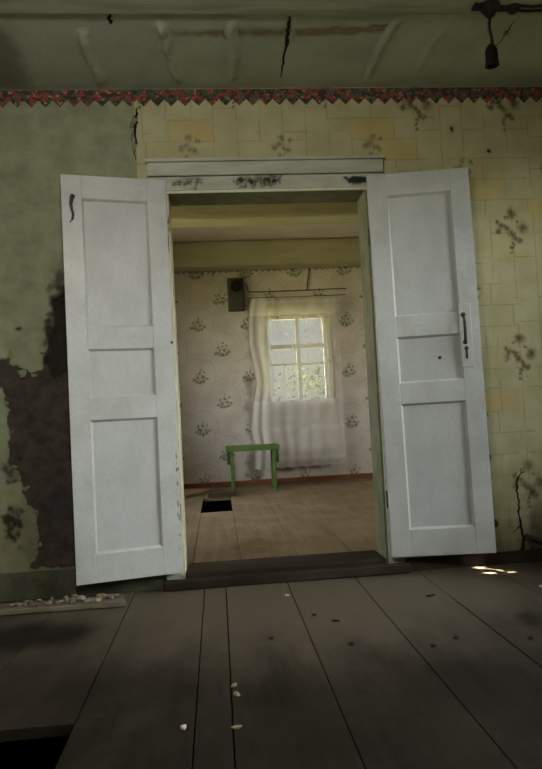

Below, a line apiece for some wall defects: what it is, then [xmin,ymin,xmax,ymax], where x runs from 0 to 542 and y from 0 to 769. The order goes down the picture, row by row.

crack [280,16,292,77]
peeling [2,507,23,541]
crack [511,471,532,550]